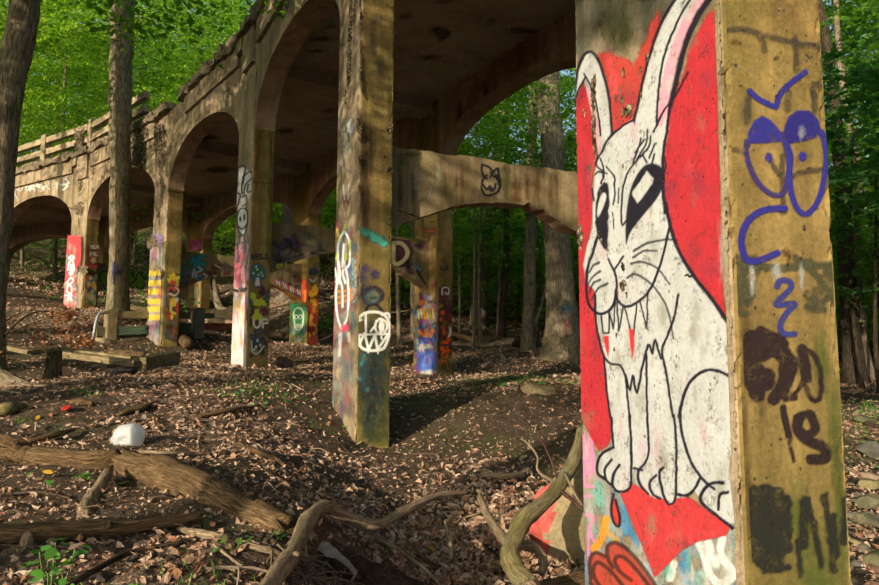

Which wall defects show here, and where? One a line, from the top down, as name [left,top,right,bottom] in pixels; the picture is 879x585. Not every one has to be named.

leakage [576,0,669,59]
leakage [791,500,805,537]